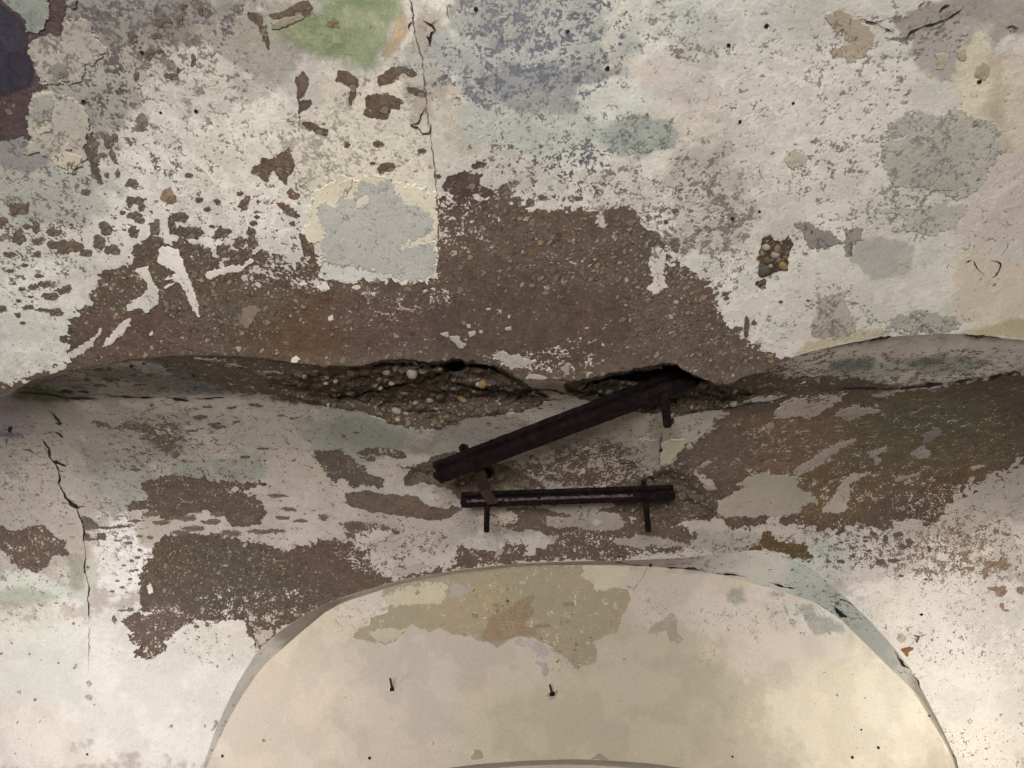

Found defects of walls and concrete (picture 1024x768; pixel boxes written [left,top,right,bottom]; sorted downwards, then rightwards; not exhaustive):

peeling [144,3,203,61]
peeling [247,0,313,50]
peeling [0,0,108,141]
peeling [135,112,148,131]
peeling [164,53,196,79]
peeling [294,71,328,136]
peeling [335,66,427,119]
crack [408,0,451,352]
peeling [0,133,1024,677]
crack [6,390,224,665]